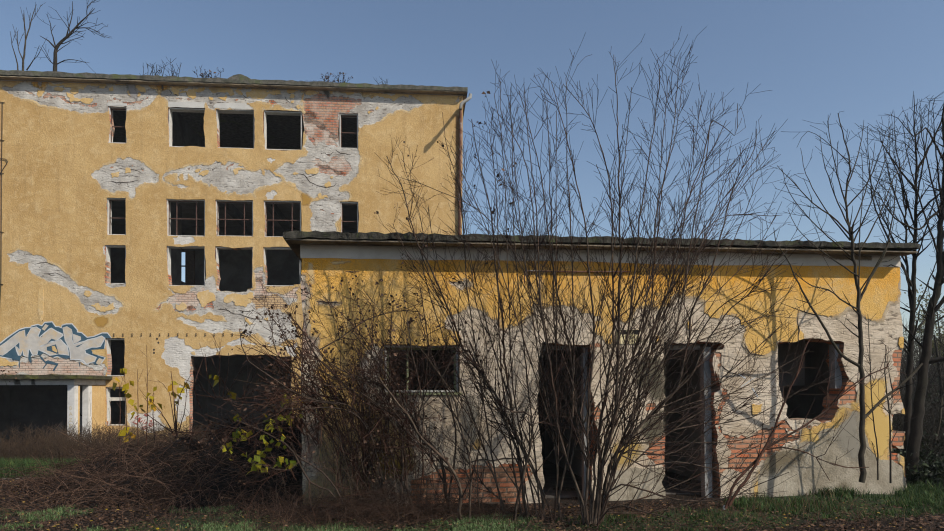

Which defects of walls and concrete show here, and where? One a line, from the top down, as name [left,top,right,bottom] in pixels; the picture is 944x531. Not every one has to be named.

peeling [2,81,460,232]
peeling [7,246,126,316]
peeling [127,410,166,433]
peeling [154,266,340,493]
peeling [359,276,907,505]